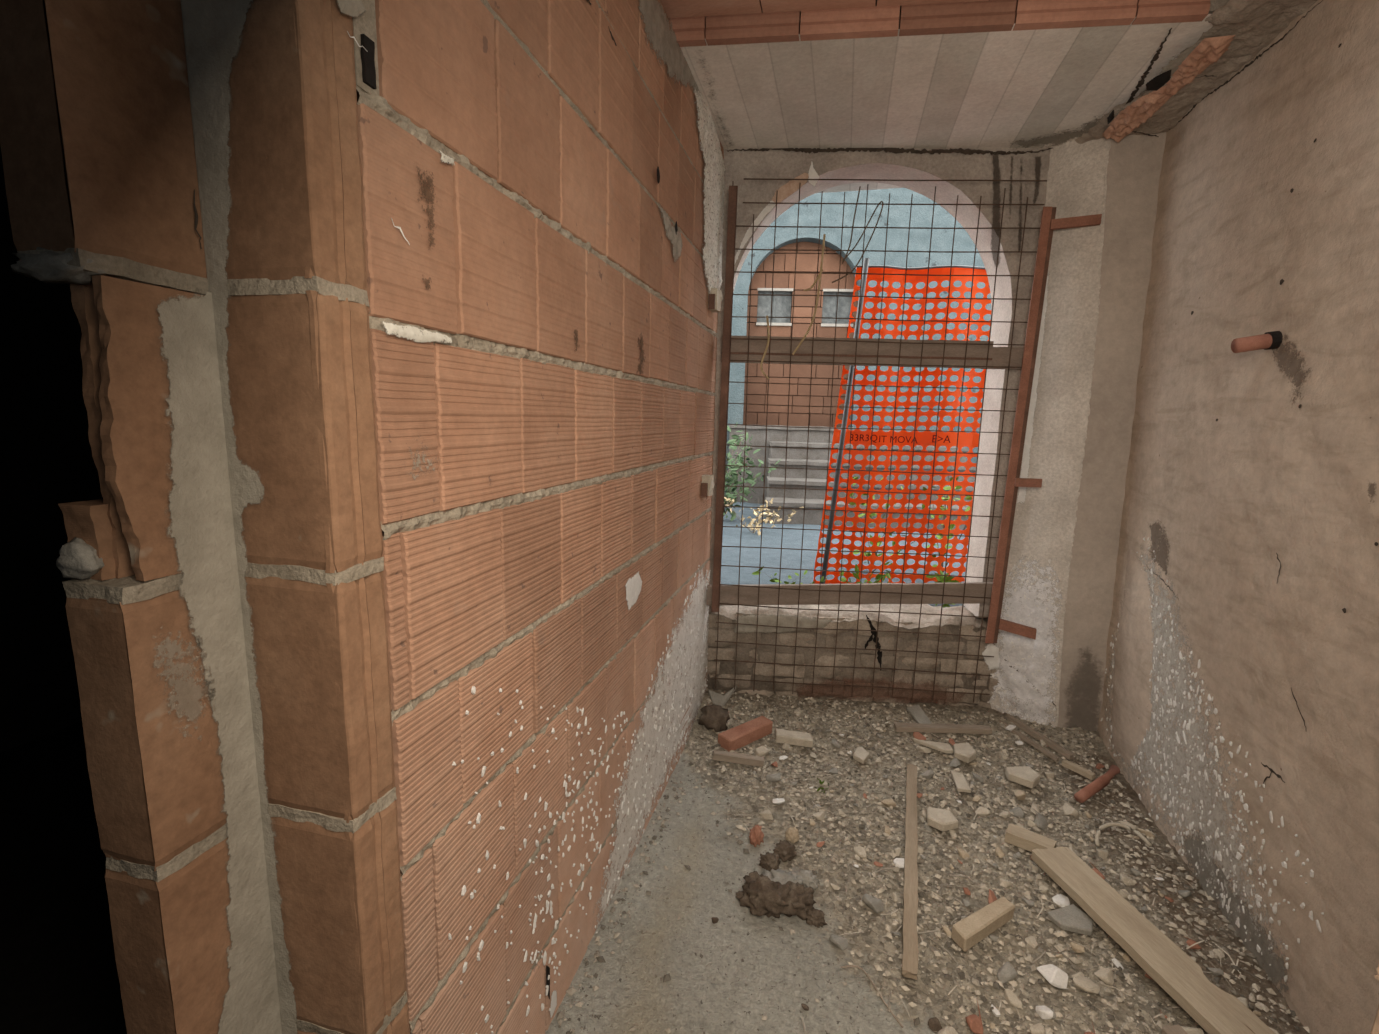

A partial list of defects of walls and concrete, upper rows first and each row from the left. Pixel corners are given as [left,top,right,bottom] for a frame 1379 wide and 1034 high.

spalling [1103,35,1235,143]
crack [1125,0,1323,137]
damp [990,537,1324,994]